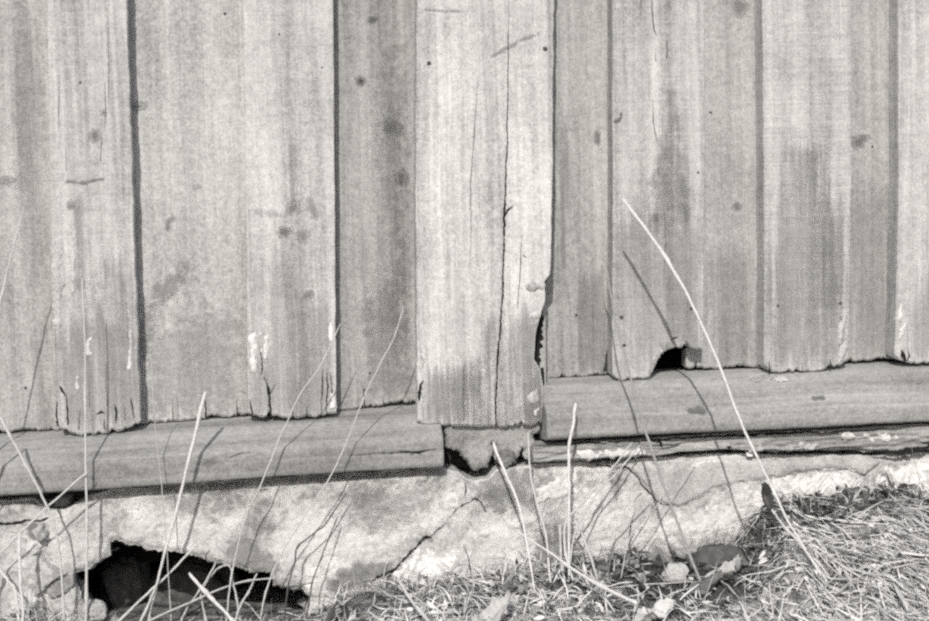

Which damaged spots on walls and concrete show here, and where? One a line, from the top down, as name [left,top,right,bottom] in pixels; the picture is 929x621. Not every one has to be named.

crack [494,0,525,426]
crack [534,280,546,386]
crack [533,428,929,506]
spalling [45,540,143,603]
spalling [265,571,309,611]
crack [372,484,486,581]